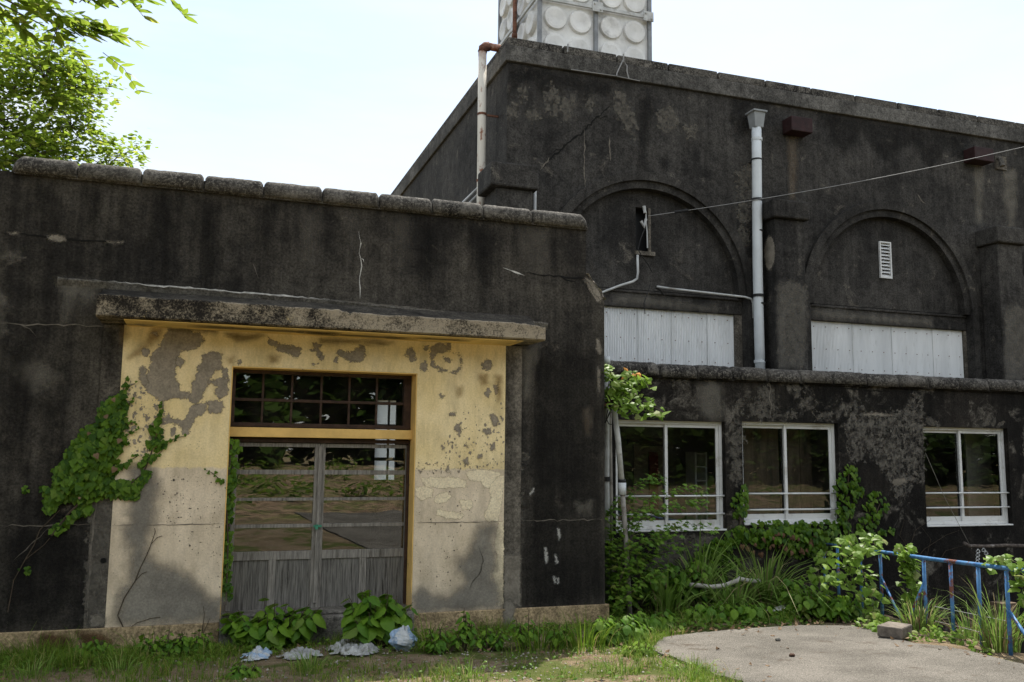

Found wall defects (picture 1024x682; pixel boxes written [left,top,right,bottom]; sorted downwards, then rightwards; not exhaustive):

crack [540,106,611,187]
crack [357,235,365,293]
peeling [125,328,242,456]
peeling [268,337,366,366]
peeling [405,342,463,375]
peeling [415,383,505,607]